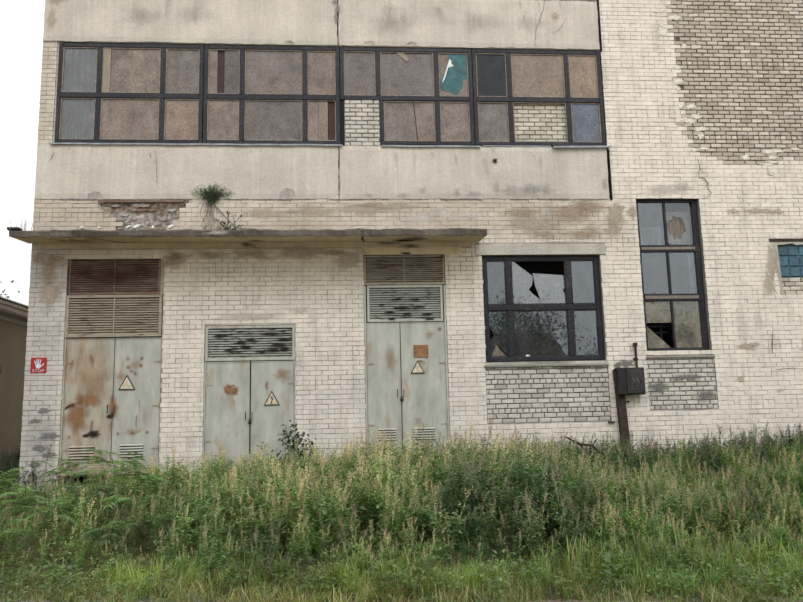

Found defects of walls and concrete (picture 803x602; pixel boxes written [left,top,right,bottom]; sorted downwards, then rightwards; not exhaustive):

peeling [652,0,803,165]
spalling [73,191,189,230]
corrosion [65,378,99,438]